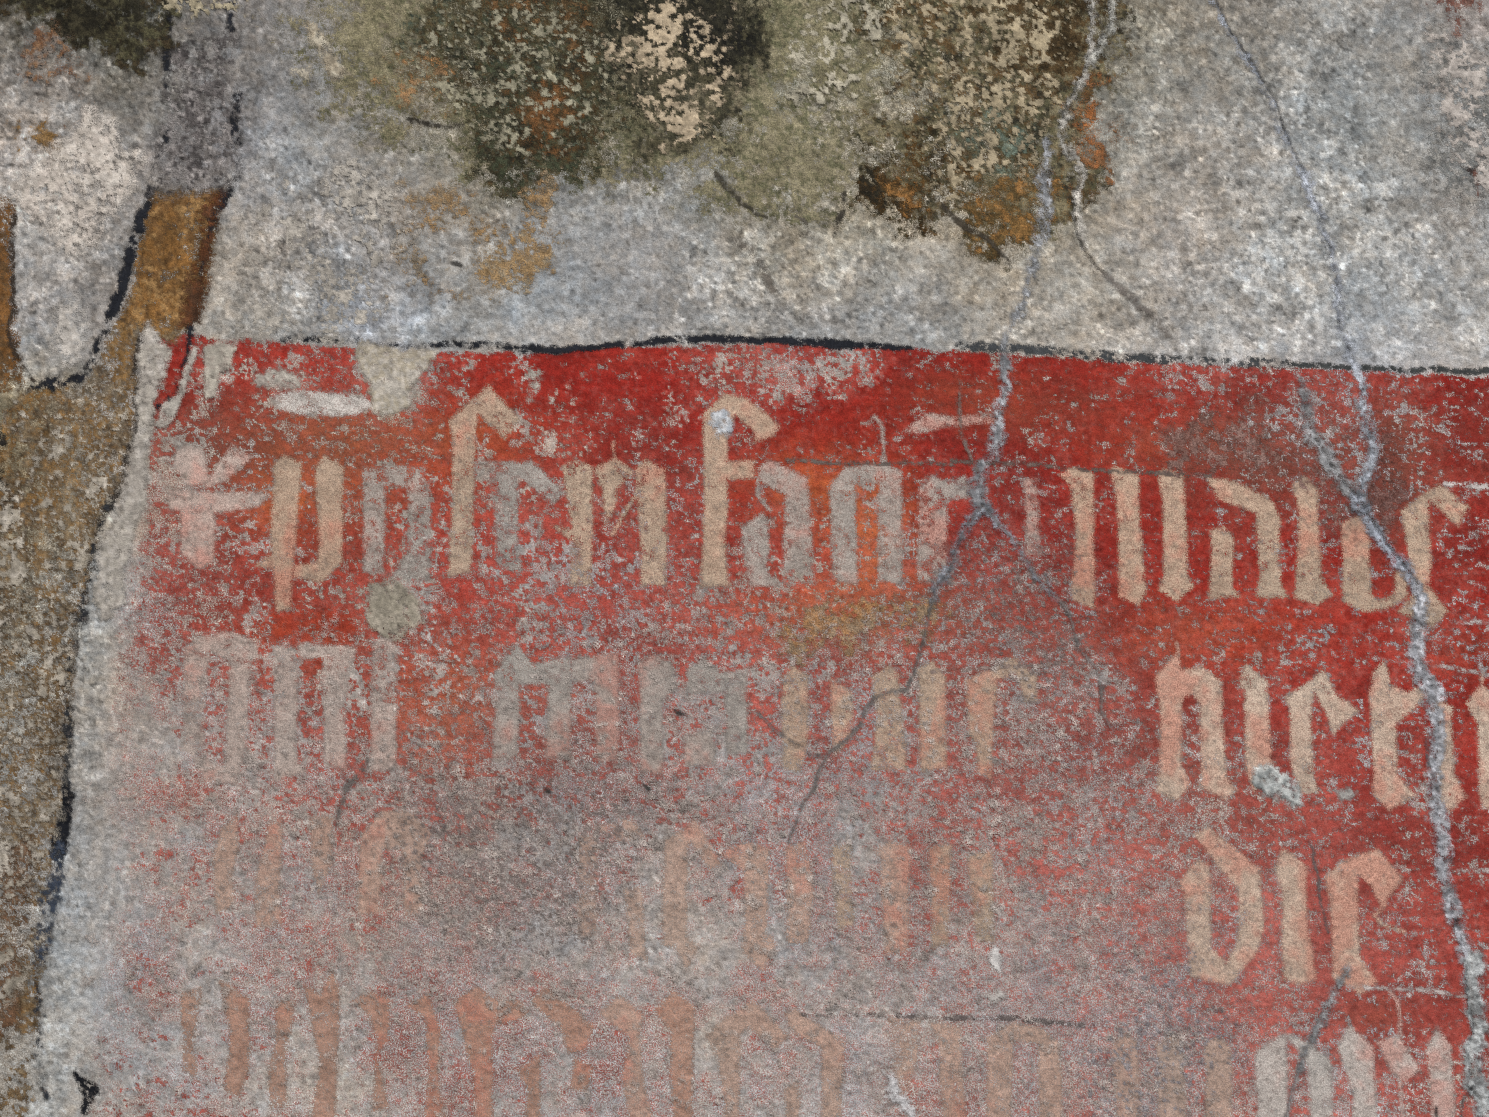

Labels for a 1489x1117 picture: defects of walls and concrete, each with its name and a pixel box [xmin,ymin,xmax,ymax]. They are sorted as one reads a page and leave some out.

water stain [393,0,778,205]
crack [758,0,1172,844]
water stain [847,0,1136,271]
crack [1209,1,1489,1117]